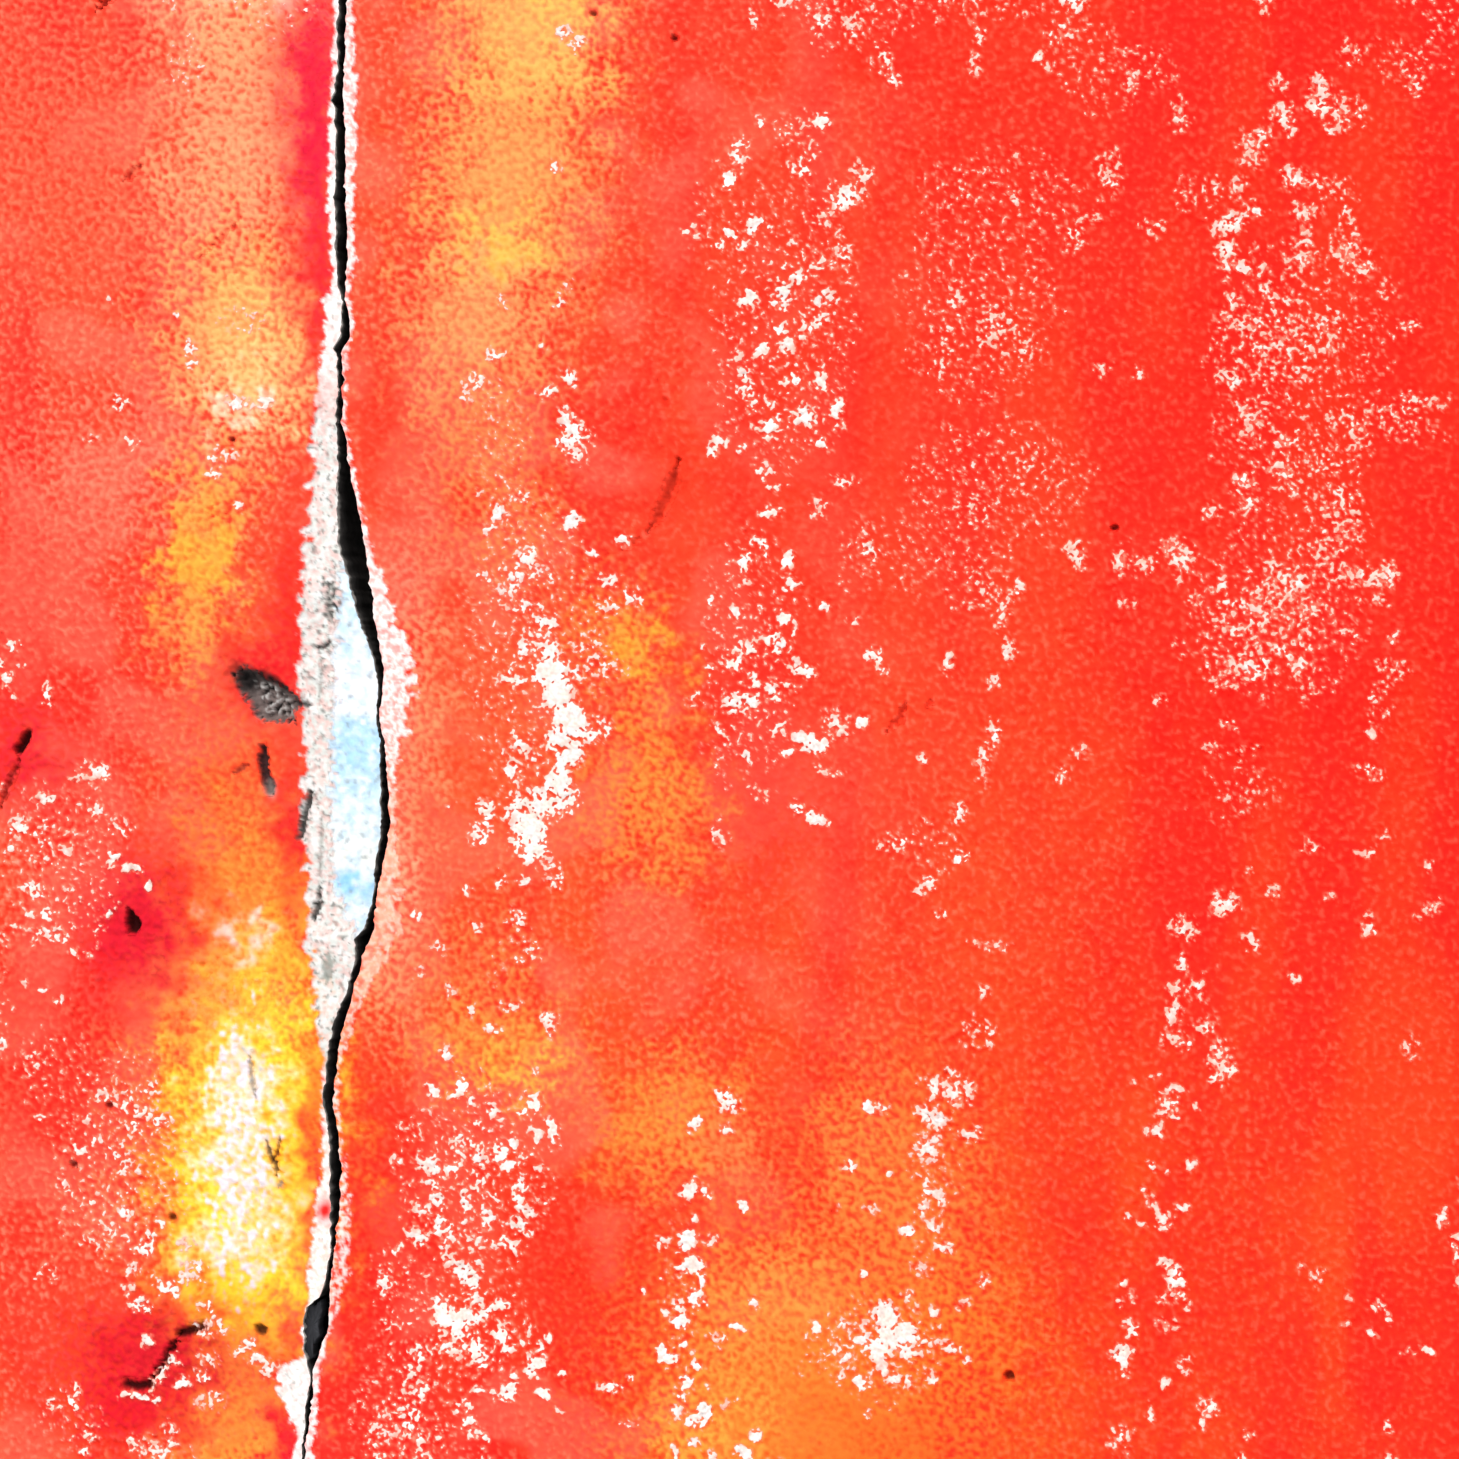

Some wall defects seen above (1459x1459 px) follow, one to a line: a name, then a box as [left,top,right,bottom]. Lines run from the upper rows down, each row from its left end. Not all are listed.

spalling [0,0,422,1459]
crack [302,0,391,1459]